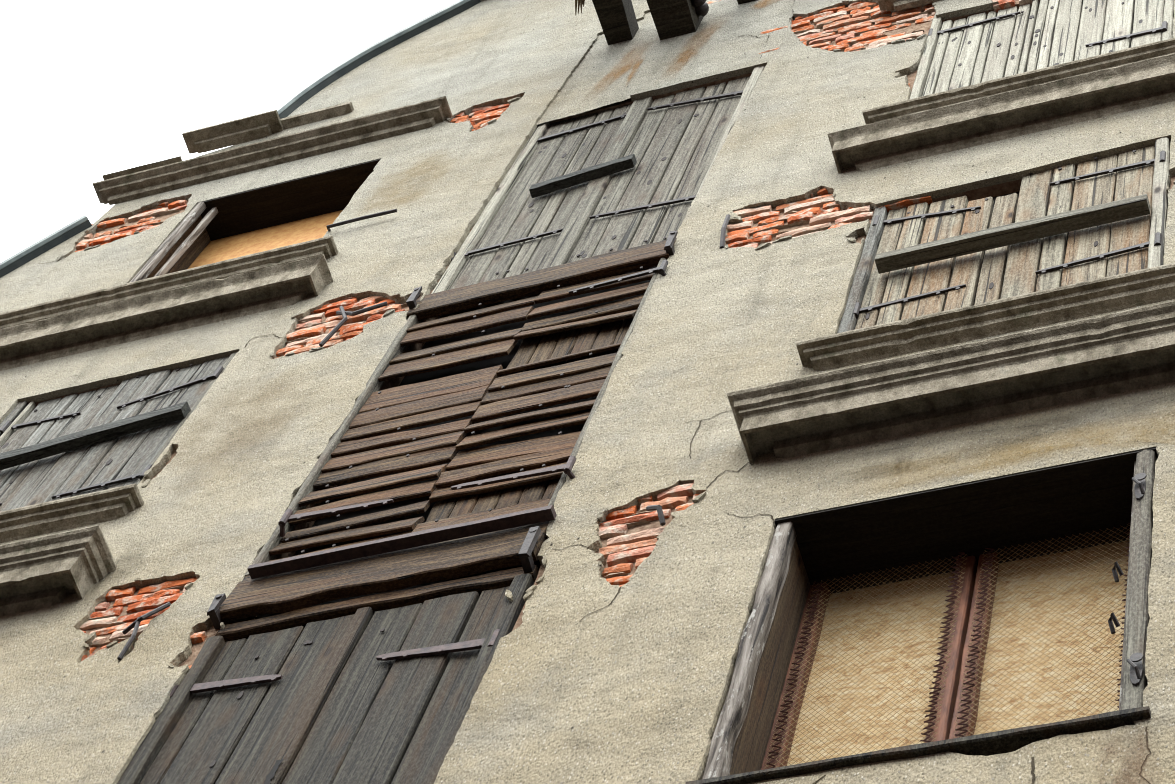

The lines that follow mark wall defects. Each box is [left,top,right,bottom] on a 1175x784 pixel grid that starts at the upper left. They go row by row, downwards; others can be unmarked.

flaking render [992,0,1033,13]
flaking render [537,0,936,125]
flaking render [446,97,520,131]
flaking render [56,199,189,262]
flaking render [725,188,933,251]
flaking render [270,290,420,359]
crack [686,410,732,458]
flaking render [587,483,706,587]
flaking render [79,577,197,661]
flaking render [190,631,207,644]
crack [1029,757,1037,784]
crack [1139,727,1151,784]